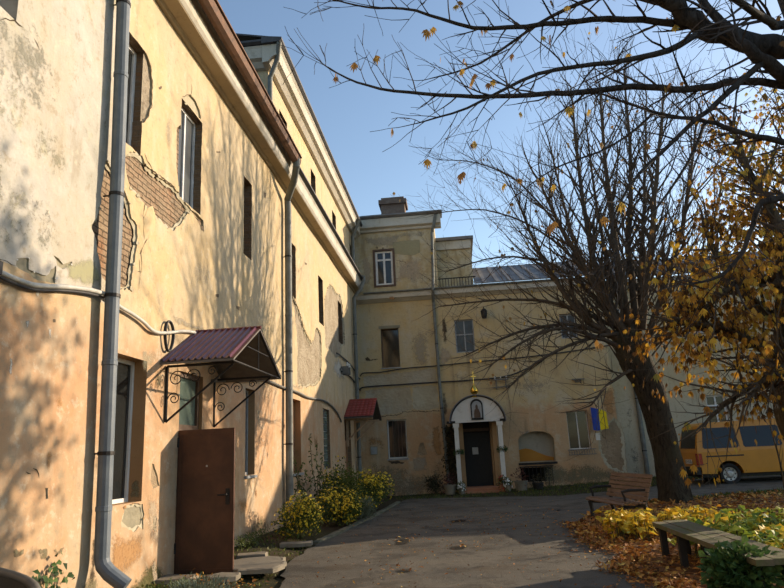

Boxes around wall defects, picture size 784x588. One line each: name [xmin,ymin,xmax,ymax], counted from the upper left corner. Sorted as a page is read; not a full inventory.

mould [0,19,46,120]
spalling [140,48,162,123]
peeling [16,257,73,283]
spalling [90,161,110,285]
spalling [120,152,204,291]
spalling [292,284,344,387]
spalling [597,417,628,473]
peeling [113,481,160,571]